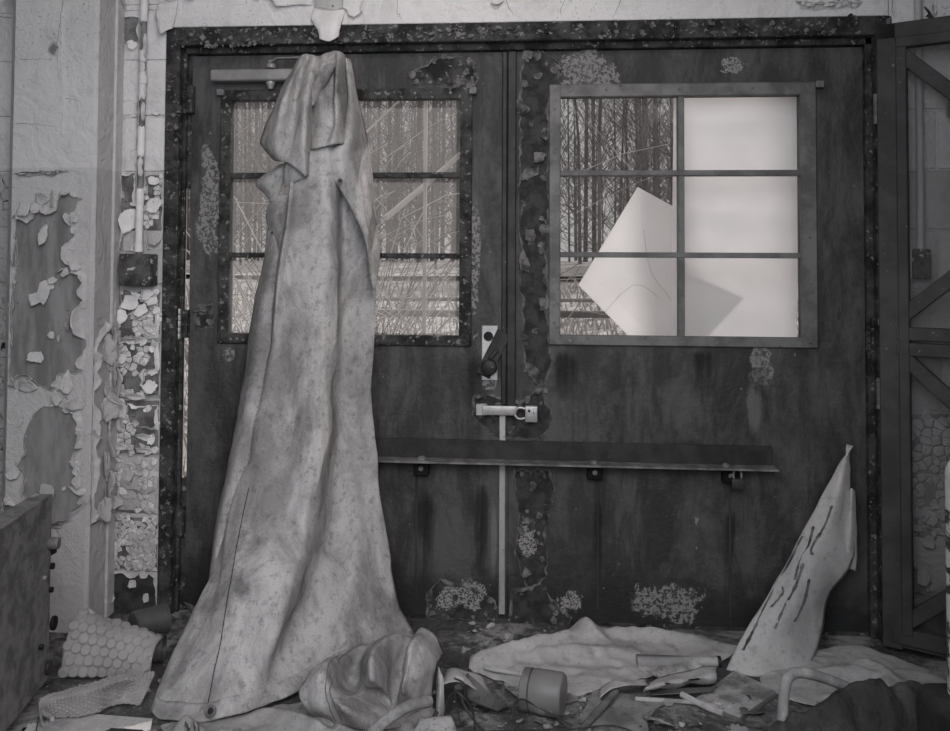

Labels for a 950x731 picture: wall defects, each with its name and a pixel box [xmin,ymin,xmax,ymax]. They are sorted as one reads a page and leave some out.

peeling [122,0,147,58]
peeling [156,0,178,34]
peeling [166,0,520,150]
corrosion [407,54,479,88]
peeling [14,169,71,178]
peeling [118,157,164,254]
corrosion [471,50,574,441]
peeling [1,189,162,614]